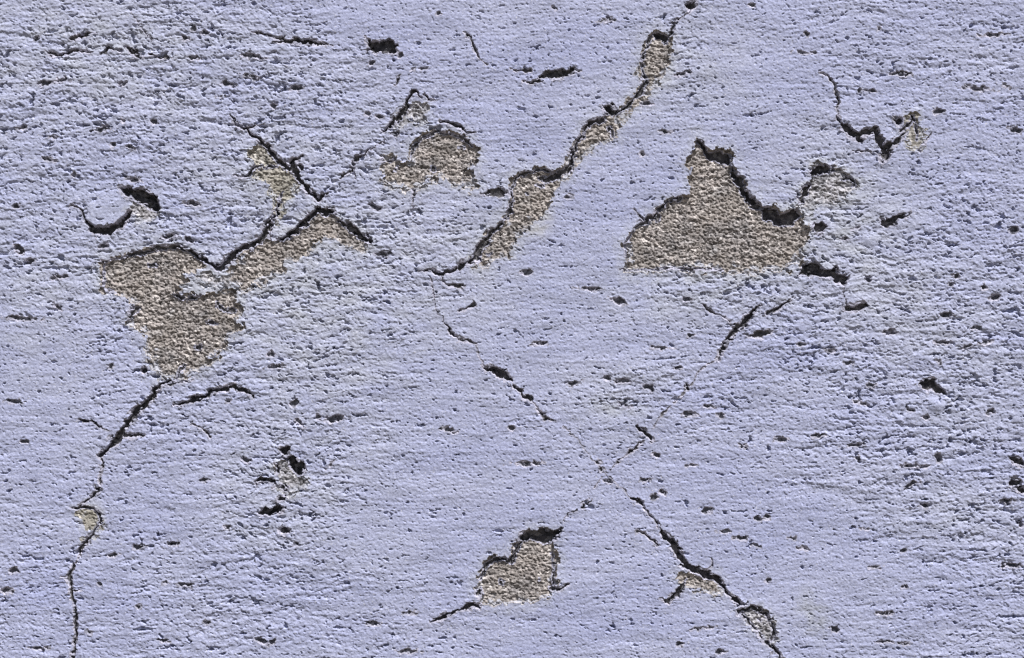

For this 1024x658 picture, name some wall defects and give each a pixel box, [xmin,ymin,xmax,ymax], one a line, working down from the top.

spalling [97,144,392,382]
crack [190,74,477,275]
spalling [378,126,509,217]
spalling [509,65,582,86]
crack [417,0,794,658]
spalling [618,137,870,314]
crack [818,71,932,166]
crack [60,363,255,658]
spalling [429,498,593,624]
spalling [675,625,718,648]